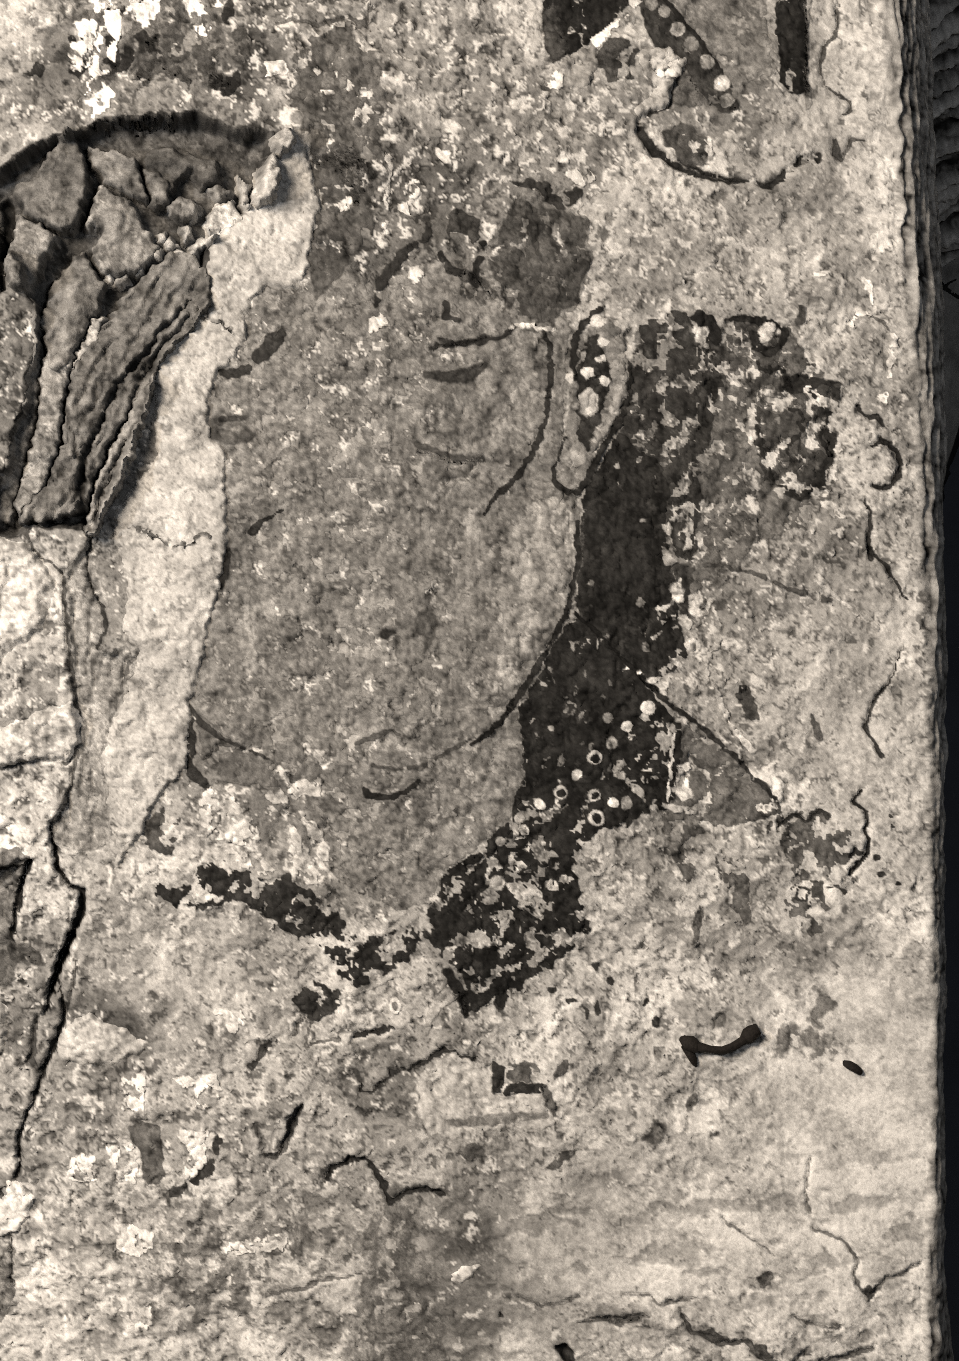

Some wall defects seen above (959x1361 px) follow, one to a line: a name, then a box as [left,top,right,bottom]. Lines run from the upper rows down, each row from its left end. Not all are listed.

crack [854,312,889,331]
crack [128,525,212,549]
crack [856,404,909,600]
crack [0,529,140,1195]
spalling [0,846,45,986]
crack [722,1216,774,1256]
crack [806,1157,920,1302]
crack [0,1237,16,1322]
crack [516,1294,874,1361]